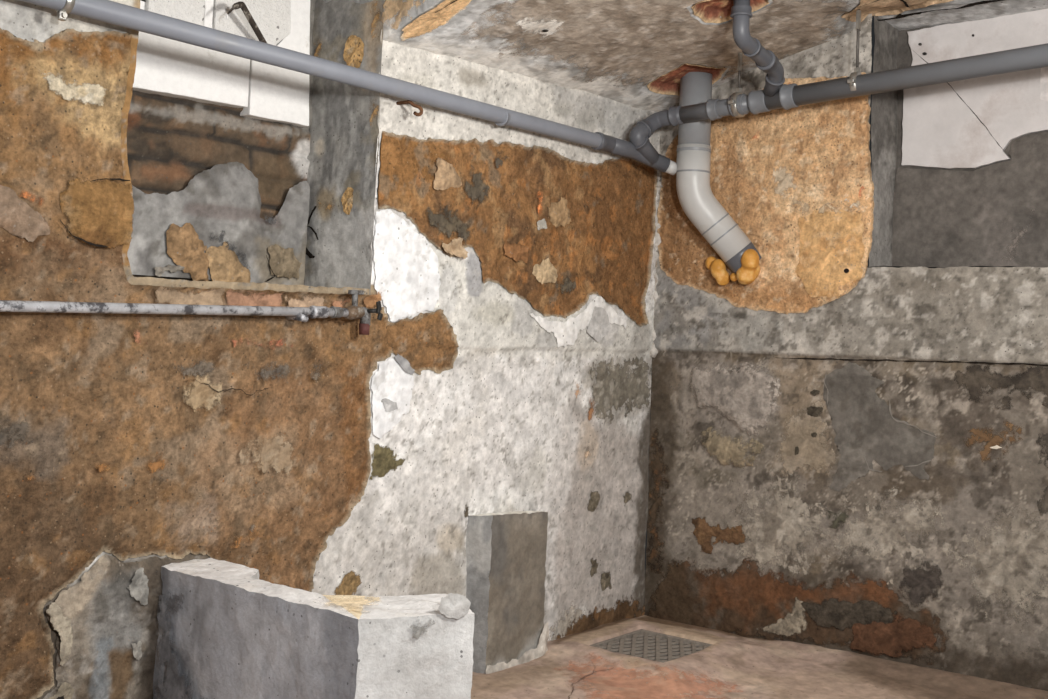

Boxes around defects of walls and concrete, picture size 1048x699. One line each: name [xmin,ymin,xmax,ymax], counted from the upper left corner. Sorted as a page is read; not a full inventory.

spalling [378,0,472,41]
spalling [841,0,953,22]
spalling [343,35,364,68]
spalling [784,76,848,85]
spalling [0,28,352,308]
spalling [0,95,874,699]
water stain [954,364,1048,410]
water stain [1036,433,1048,465]
water stain [646,429,669,574]
water stain [730,468,1048,623]
corrosion [648,557,949,665]